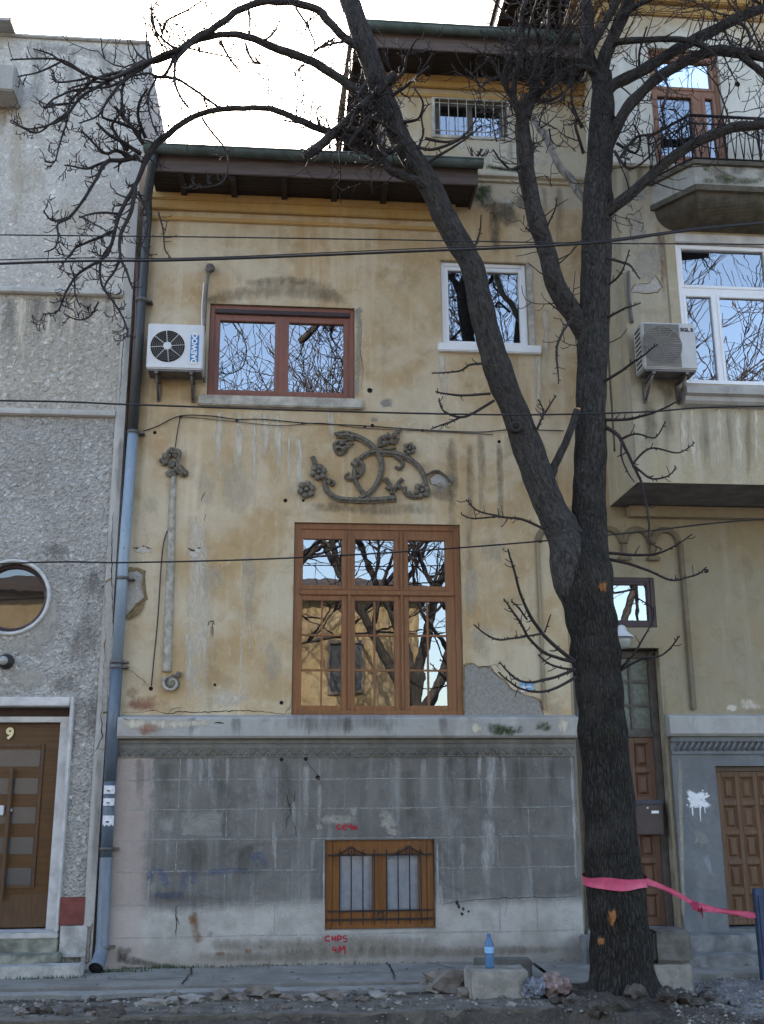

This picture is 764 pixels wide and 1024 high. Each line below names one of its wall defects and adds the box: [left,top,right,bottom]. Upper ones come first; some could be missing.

water stain [235,414,303,496]
flaking render [102,567,148,714]
spalling [462,663,544,715]